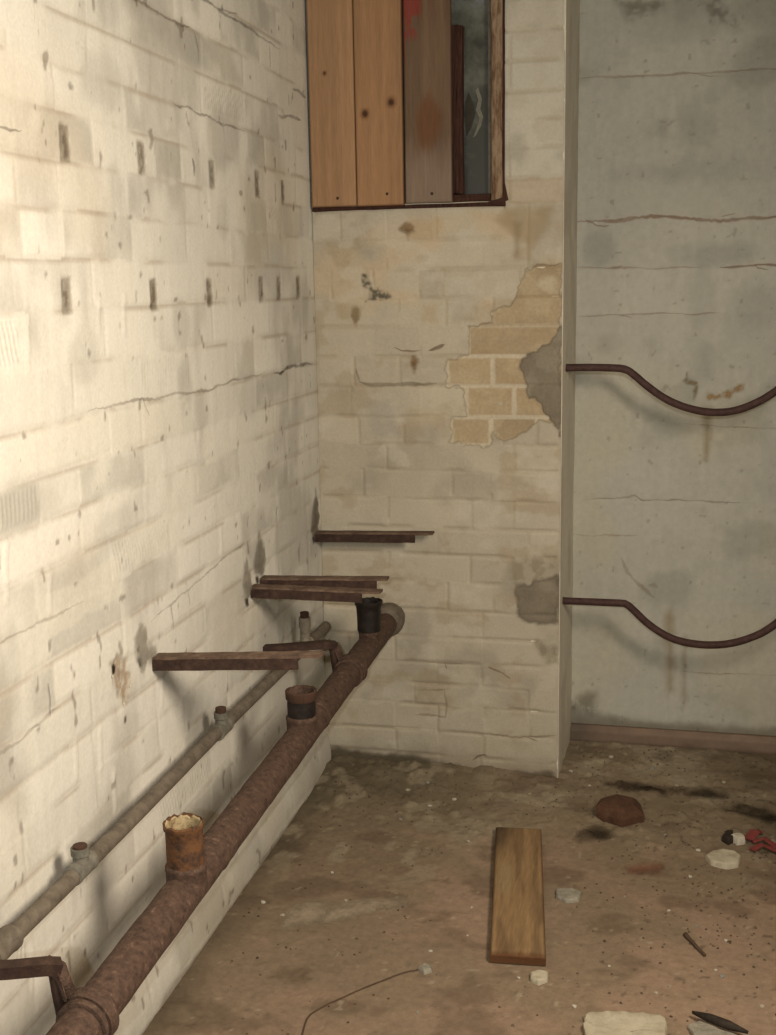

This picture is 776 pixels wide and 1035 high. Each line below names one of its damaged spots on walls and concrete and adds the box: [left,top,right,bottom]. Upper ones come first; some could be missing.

peeling [445,263,562,448]
rust [685,378,741,399]